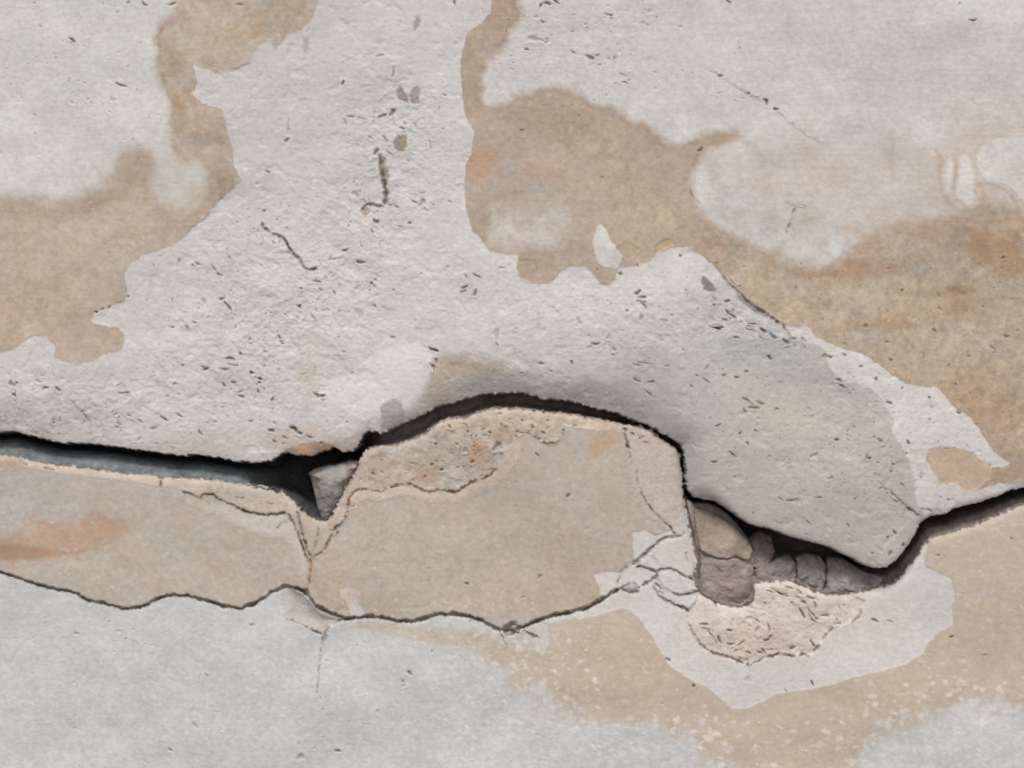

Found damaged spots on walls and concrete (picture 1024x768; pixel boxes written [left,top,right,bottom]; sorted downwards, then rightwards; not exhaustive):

damp [0,0,317,363]
peeling [0,0,1024,524]
damp [461,0,1024,489]
peeling [0,458,366,649]
crack [0,391,1024,693]
peeling [570,427,956,710]